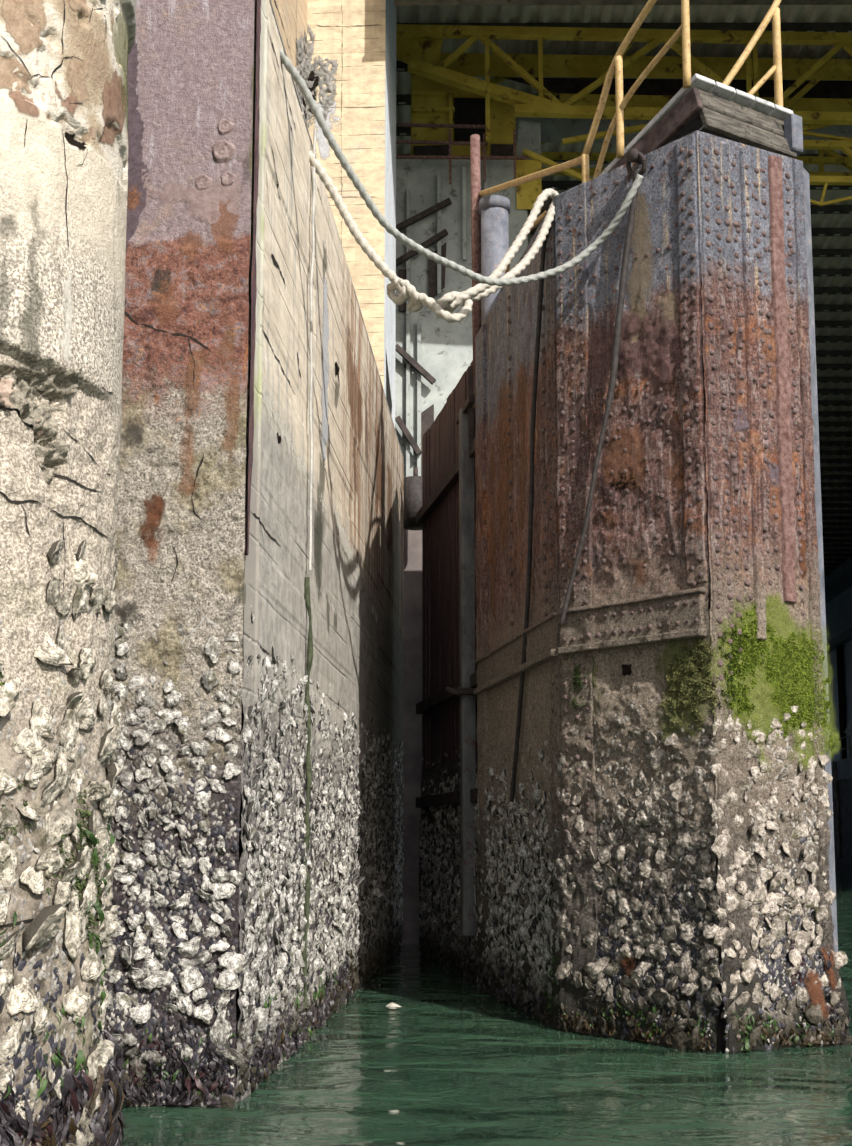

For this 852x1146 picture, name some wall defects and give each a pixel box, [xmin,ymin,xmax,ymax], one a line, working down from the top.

flaking render [0,0,47,116]
flaking render [56,56,89,117]
spalling [296,25,338,128]
peeling [62,41,243,248]
rust [212,201,237,250]
crack [54,431,113,493]
rust [603,426,646,489]
crack [0,491,109,618]
rust [139,495,165,560]
rust [806,948,836,1019]